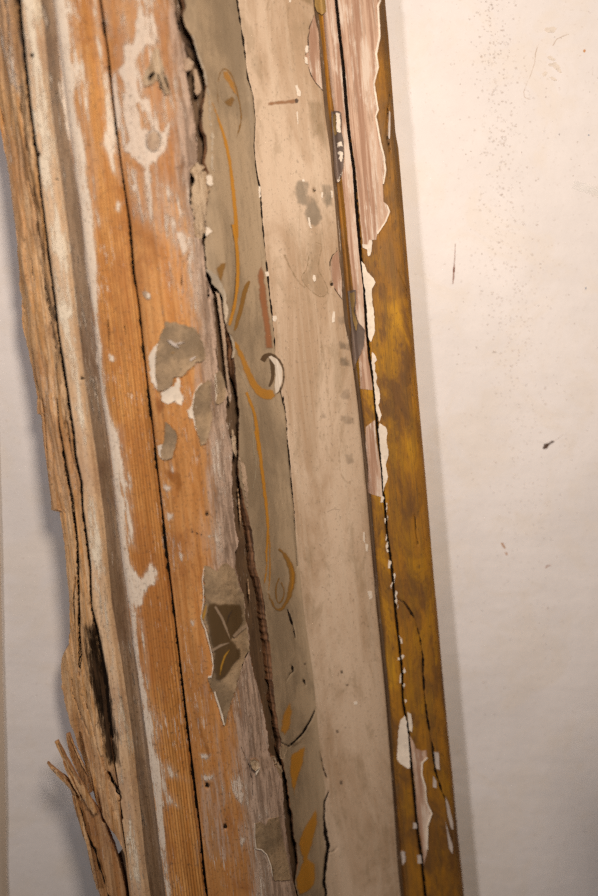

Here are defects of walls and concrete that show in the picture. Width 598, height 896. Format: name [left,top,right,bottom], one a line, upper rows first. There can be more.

crack [236,0,275,346]
peeling [305,0,390,522]
crack [2,0,114,736]
crack [100,0,208,896]
peeling [158,422,177,460]
peeling [148,269,235,445]
crack [280,386,297,559]
peeling [201,563,250,726]
crack [282,710,315,747]
peeling [397,699,440,864]
peeling [445,797,454,854]